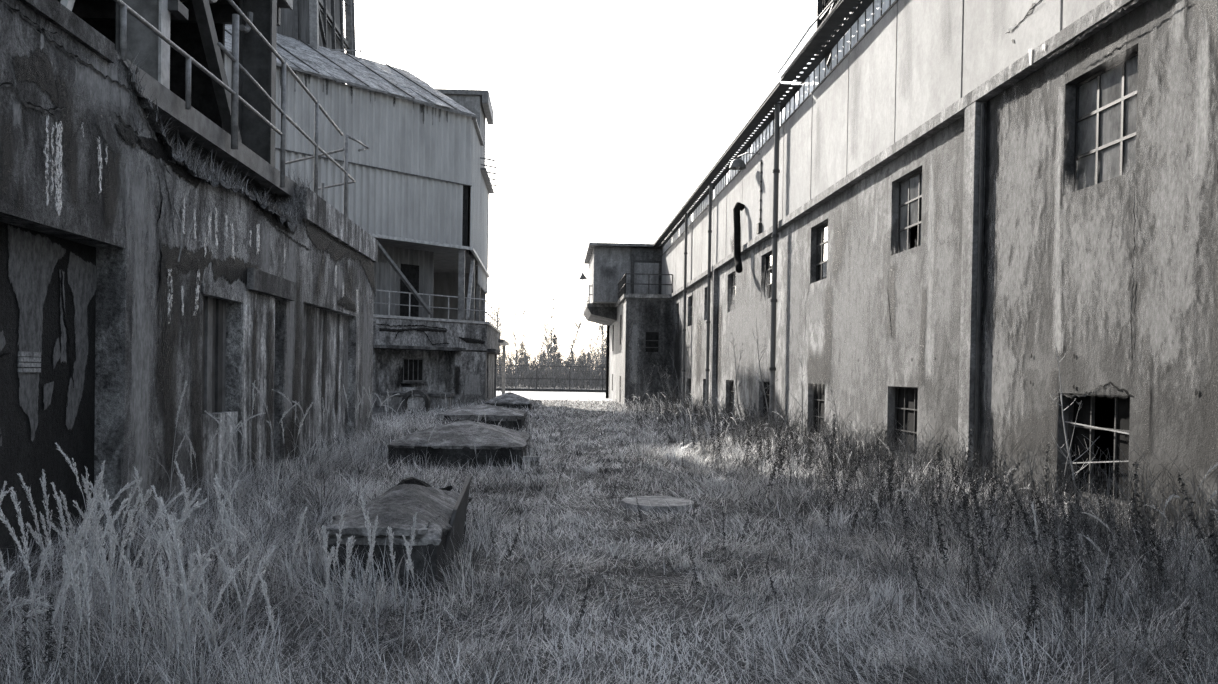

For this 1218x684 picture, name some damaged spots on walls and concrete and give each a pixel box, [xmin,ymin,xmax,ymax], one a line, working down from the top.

flaking render [0,224,97,441]
leakage [43,55,137,216]
leakage [97,137,235,519]
spalling [159,242,259,287]
leakage [249,220,370,479]
leakage [695,157,960,424]
leakage [981,0,1218,477]